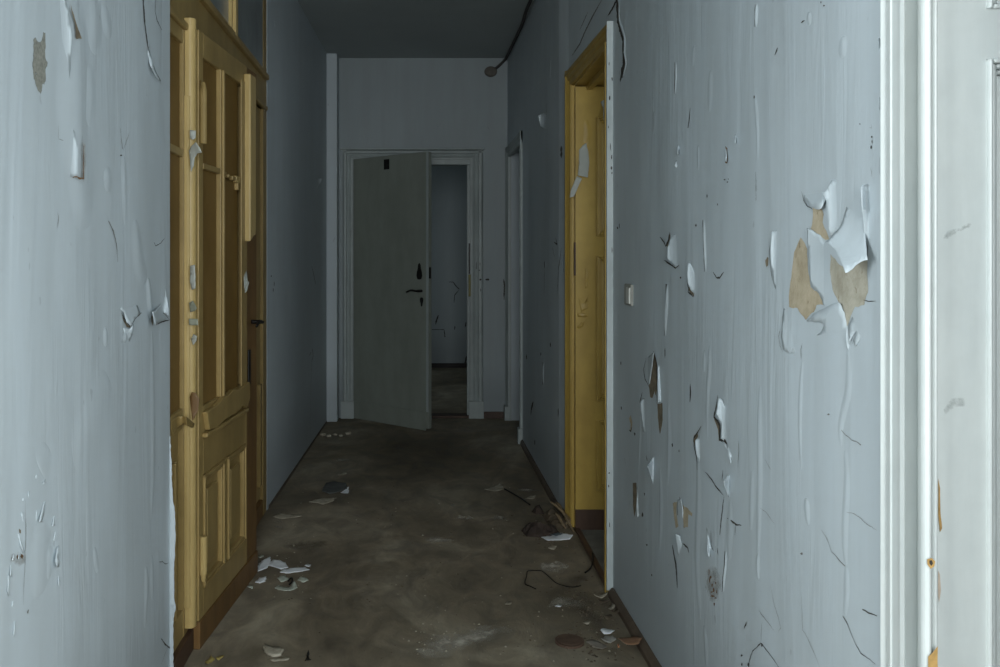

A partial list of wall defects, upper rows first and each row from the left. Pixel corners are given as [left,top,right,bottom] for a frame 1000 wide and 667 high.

peeling [60,0,82,76]
crack [573,0,627,82]
peeling [70,130,79,177]
peeling [570,143,589,197]
peeling [660,233,695,297]
peeling [765,230,777,289]
peeling [778,180,872,354]
peeling [121,290,169,341]
peeling [621,351,663,435]
peeling [693,427,701,462]
peeling [706,396,732,497]
peeling [633,483,645,518]